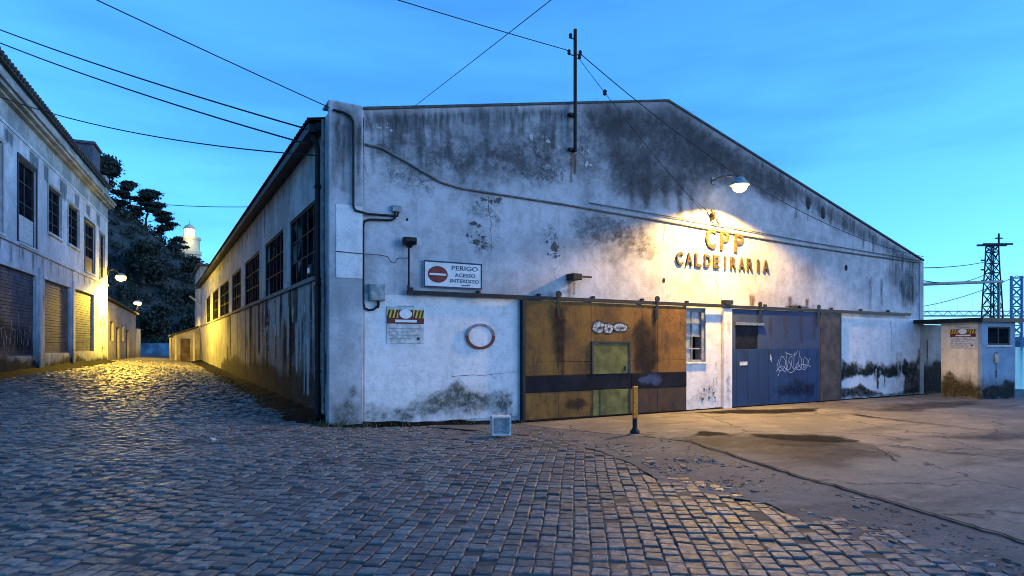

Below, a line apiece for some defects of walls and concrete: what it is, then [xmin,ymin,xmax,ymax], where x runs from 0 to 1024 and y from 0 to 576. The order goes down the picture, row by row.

water stain [336,110,448,169]
water stain [779,175,914,299]
water stain [221,279,357,423]
mould [368,387,508,420]
water stain [842,340,1015,411]